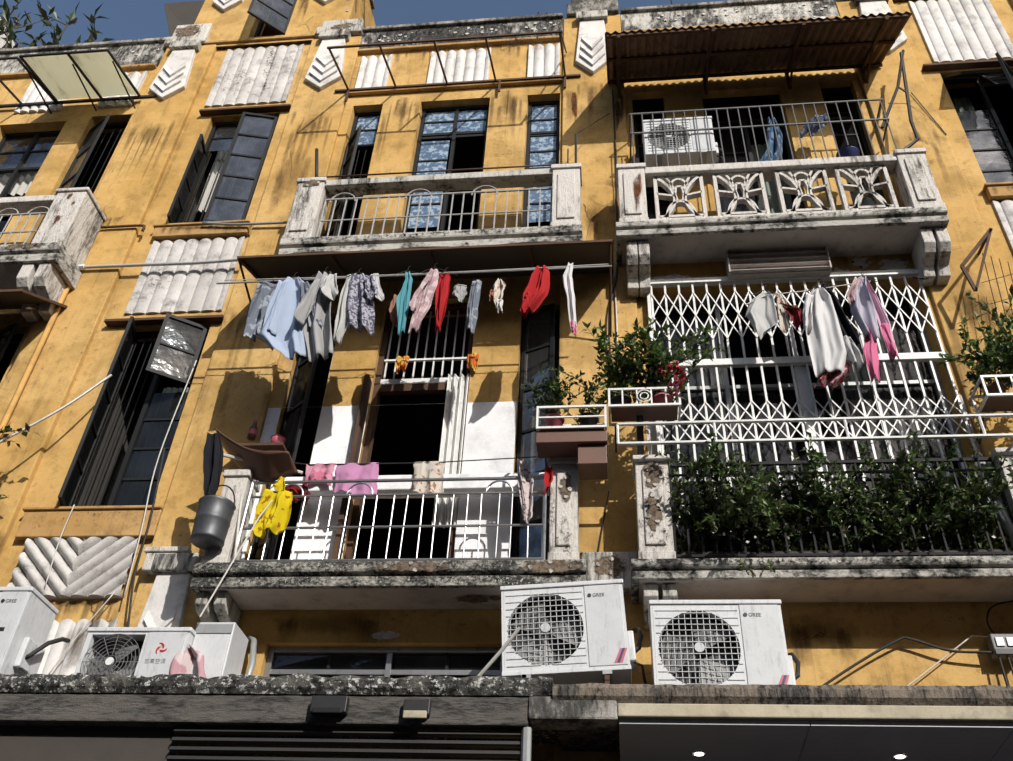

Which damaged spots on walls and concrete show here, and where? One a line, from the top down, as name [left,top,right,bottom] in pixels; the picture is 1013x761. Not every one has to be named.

corrosion [634,174,642,208]
spalling [559,472,572,502]
spalling [642,462,664,532]